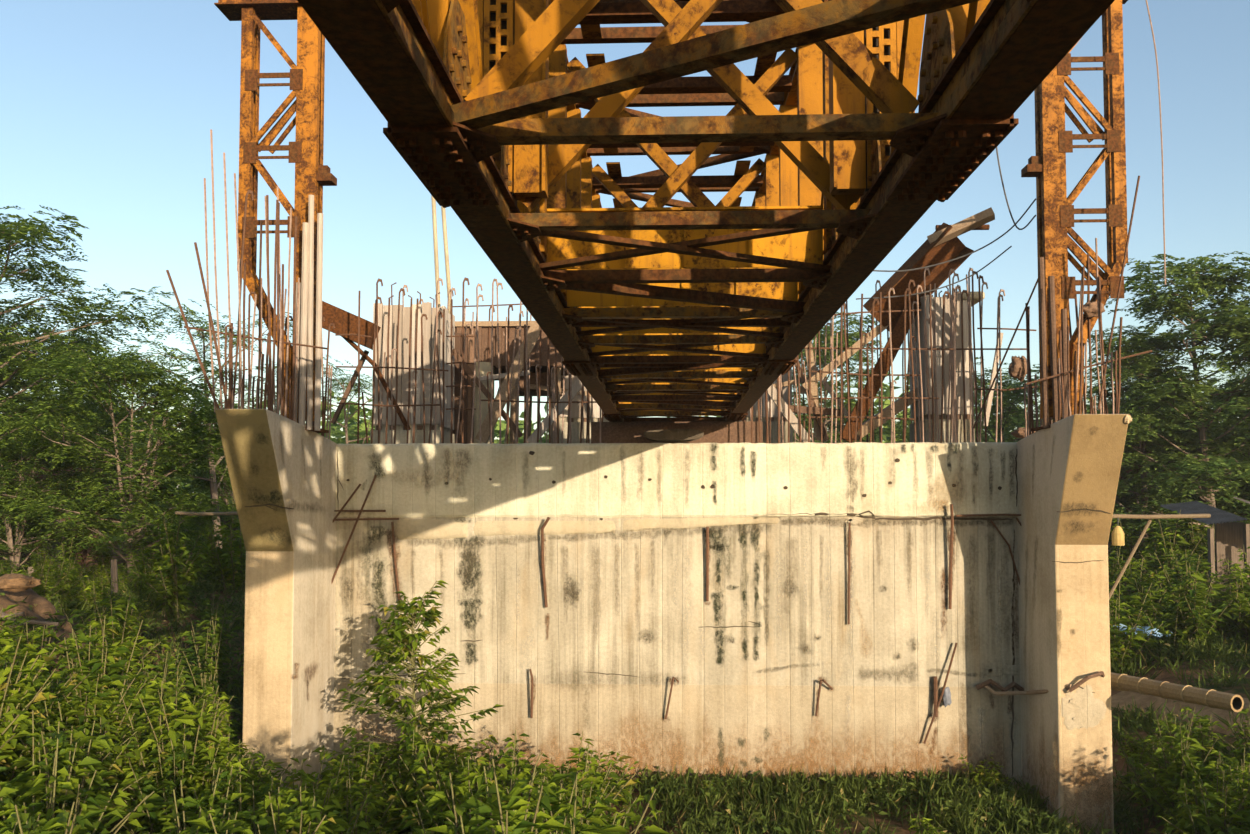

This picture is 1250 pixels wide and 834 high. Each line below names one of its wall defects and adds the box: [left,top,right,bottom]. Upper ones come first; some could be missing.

leakage [455,536,508,627]
rust [540,517,550,638]
leakage [610,517,788,671]
rust [663,677,679,720]
rust [815,678,833,716]
rust [923,642,958,754]